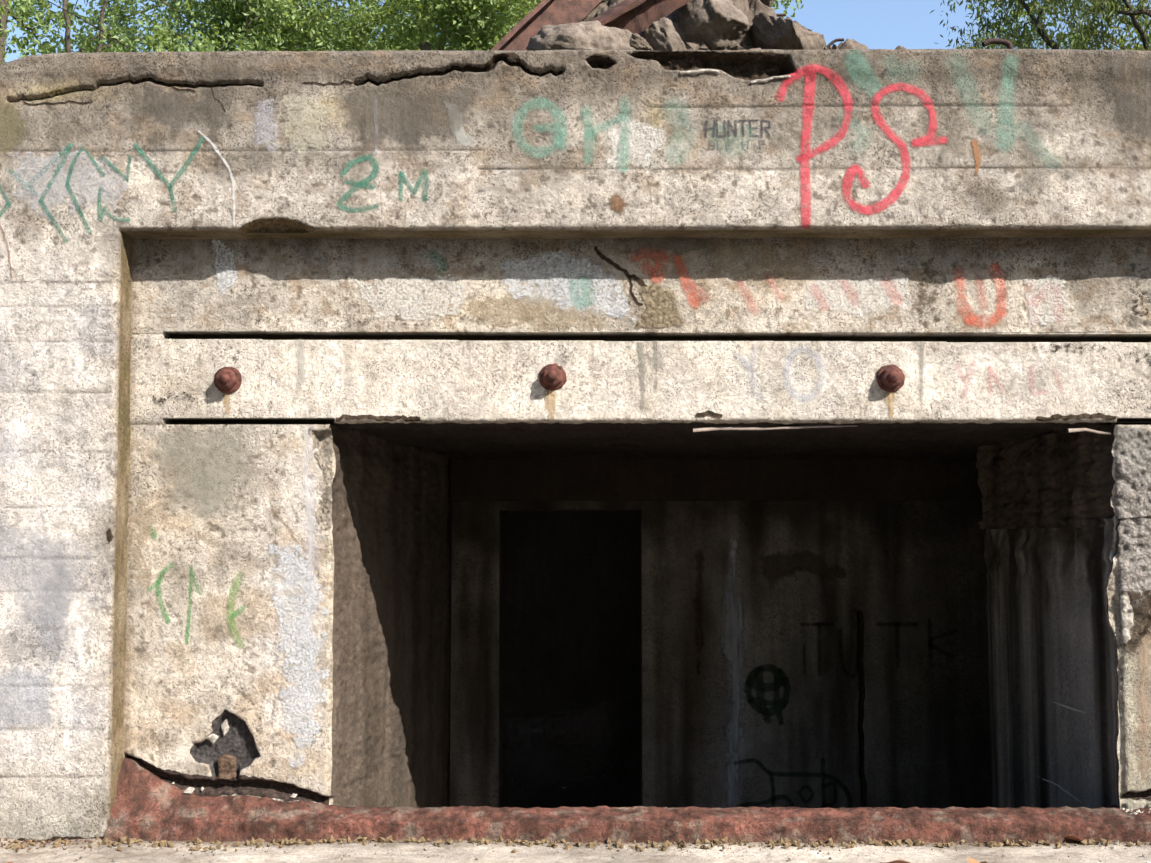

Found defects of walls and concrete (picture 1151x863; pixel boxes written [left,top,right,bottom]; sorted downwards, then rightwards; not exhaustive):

crack [18,78,260,112]
crack [594,246,648,306]
spalling [1036,413,1151,660]
spalling [190,709,261,780]
crack [1122,789,1151,801]